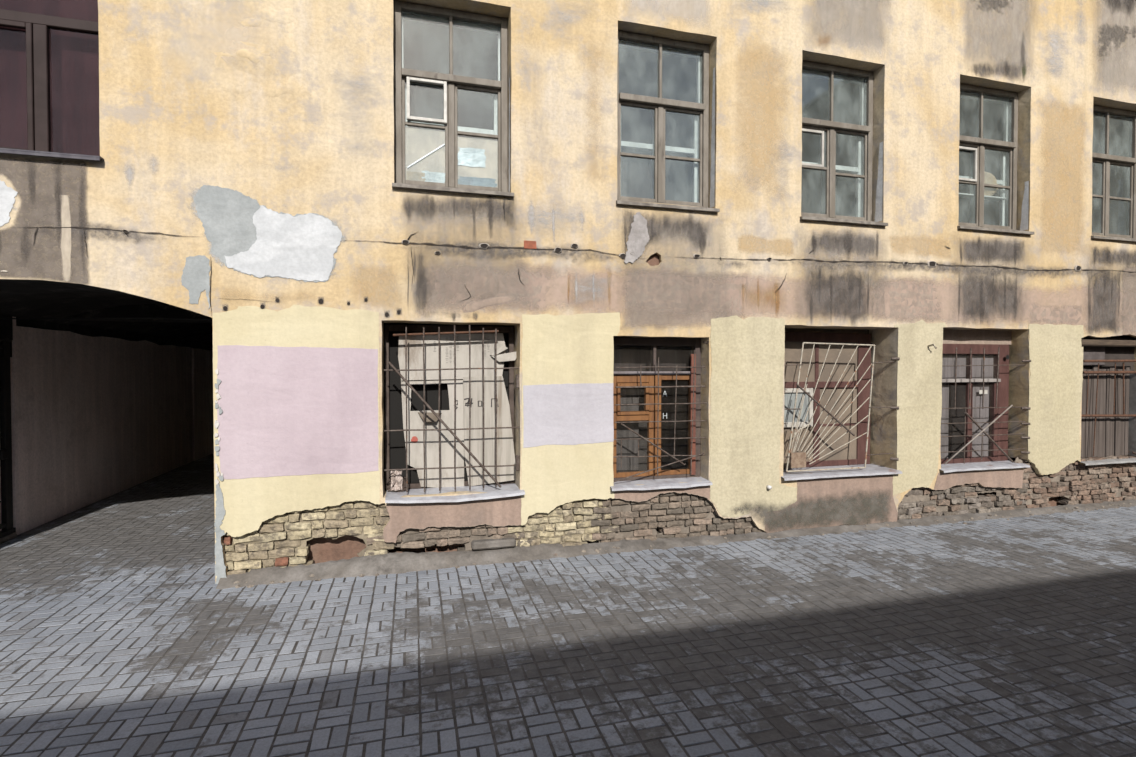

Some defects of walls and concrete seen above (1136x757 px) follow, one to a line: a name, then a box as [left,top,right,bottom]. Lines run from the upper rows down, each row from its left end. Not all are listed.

leakage [976,48,1026,78]
leakage [0,158,88,284]
leakage [408,196,513,228]
leakage [625,215,706,249]
leakage [813,235,878,253]
leakage [960,239,1020,262]
leakage [809,271,869,322]
leakage [959,276,1017,317]
leakage [1089,249,1136,332]
flaking render [214,369,765,575]
flaking render [897,450,1136,520]